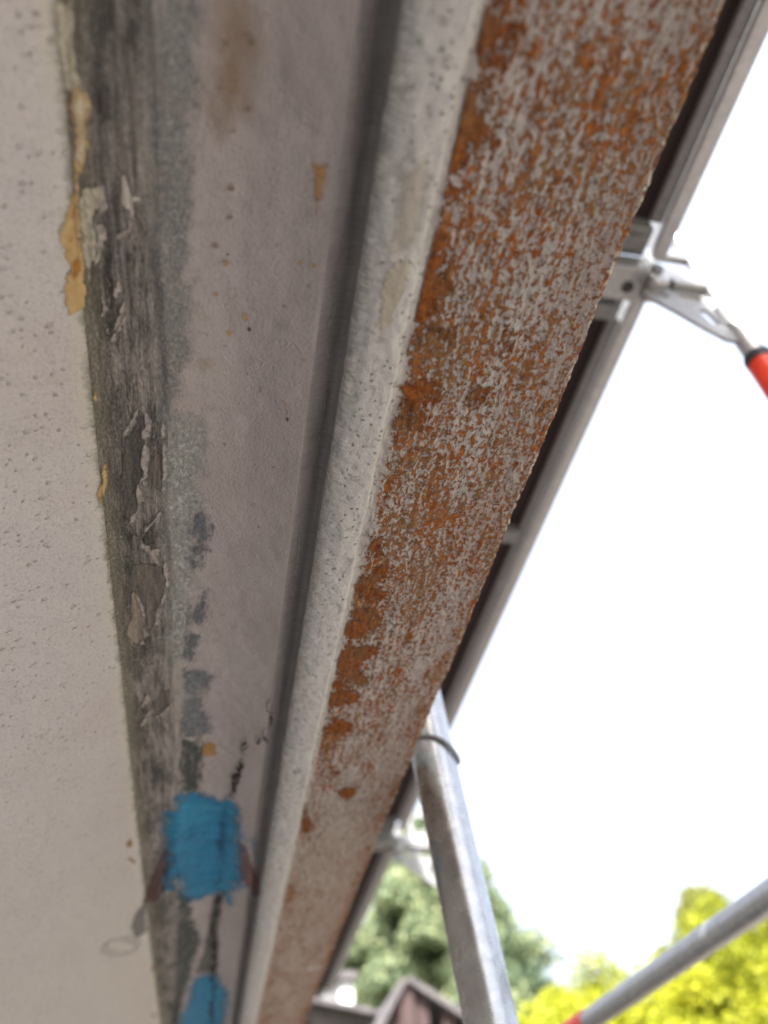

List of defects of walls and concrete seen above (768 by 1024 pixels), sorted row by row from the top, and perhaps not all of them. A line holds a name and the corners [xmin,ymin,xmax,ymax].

peeling [59,88,151,316]
peeling [100,280,127,345]
damp [151,0,214,792]
peeling [122,387,172,648]
corrosion [258,0,725,1024]
crack [229,699,273,799]
damp [172,889,202,1024]